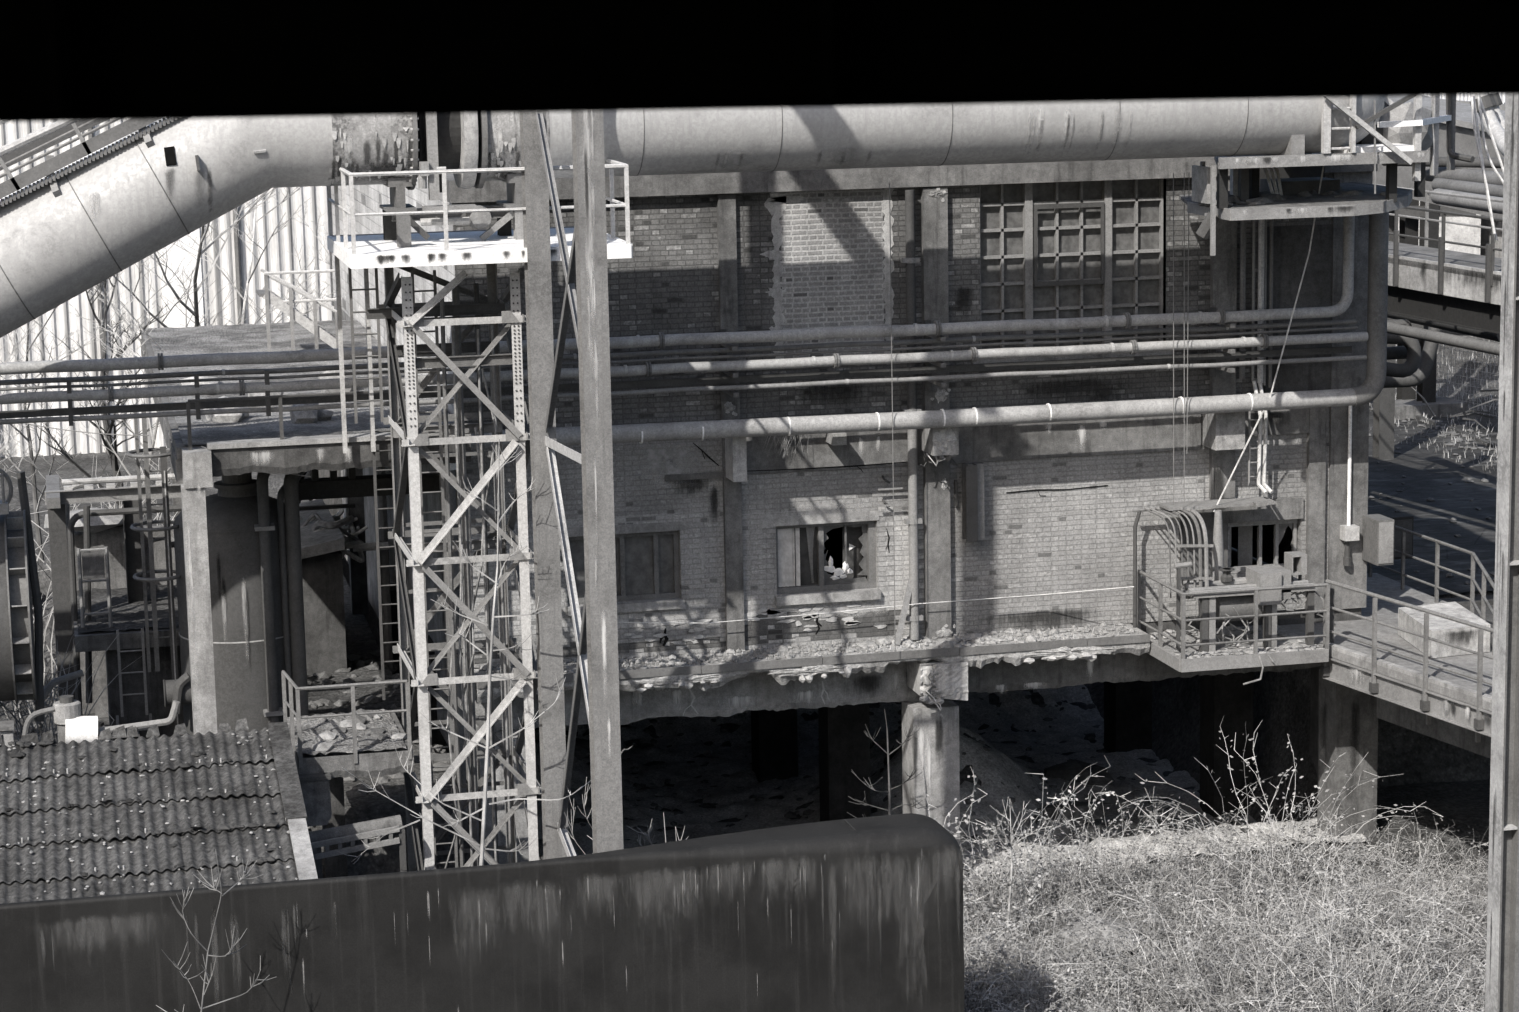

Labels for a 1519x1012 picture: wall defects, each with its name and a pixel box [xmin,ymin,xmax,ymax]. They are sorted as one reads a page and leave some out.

spalling [636,673,727,692]
spalling [769,664,852,683]
spalling [919,667,946,710]
leakage [822,871,836,942]
leakage [901,857,960,975]